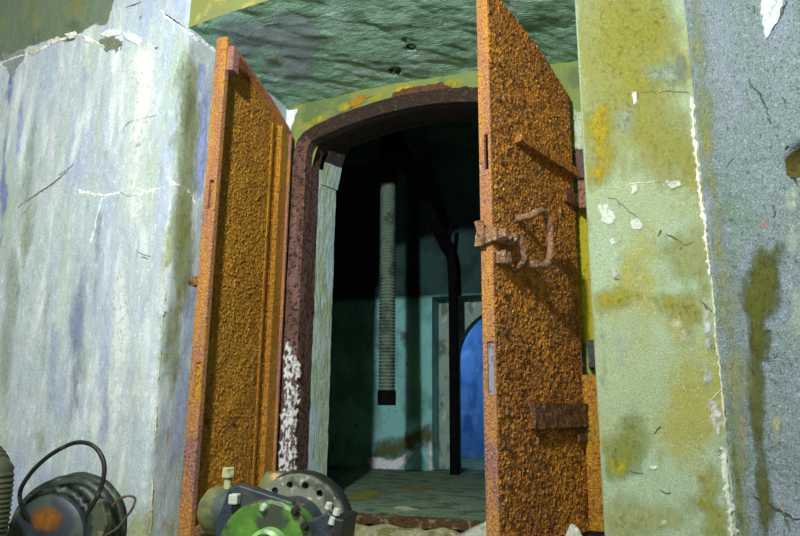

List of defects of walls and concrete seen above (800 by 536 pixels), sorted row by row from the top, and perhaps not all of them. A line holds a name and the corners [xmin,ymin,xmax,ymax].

flaking render [760,0,787,39]
flaking render [0,29,143,84]
corrosion [392,82,468,97]
crack [19,164,73,215]
crack [77,176,197,243]
peeling [598,204,616,224]
peeling [606,180,681,193]
spalling [785,146,800,187]
peeling [690,96,727,435]
damp [747,331,773,532]
peeling [717,446,740,536]